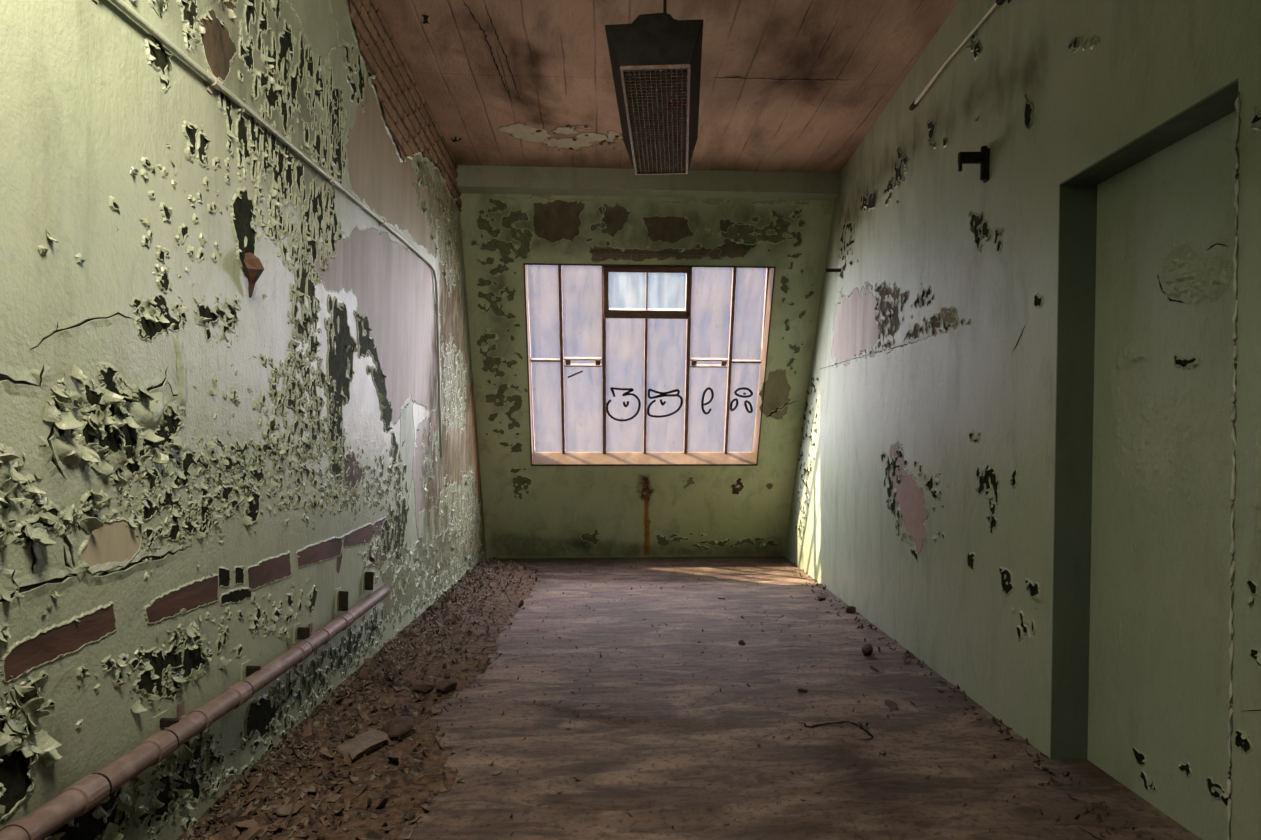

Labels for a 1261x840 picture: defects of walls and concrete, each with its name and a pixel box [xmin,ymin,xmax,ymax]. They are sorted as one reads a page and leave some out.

flaking render [831,147,971,368]
peeling [968,211,1004,254]
crack [0,304,137,486]
flaking render [0,0,819,840]
rust [640,476,653,555]
flaking render [881,441,948,562]
peeling [975,463,1018,535]
peeling [967,551,976,572]
peeling [999,566,1042,642]